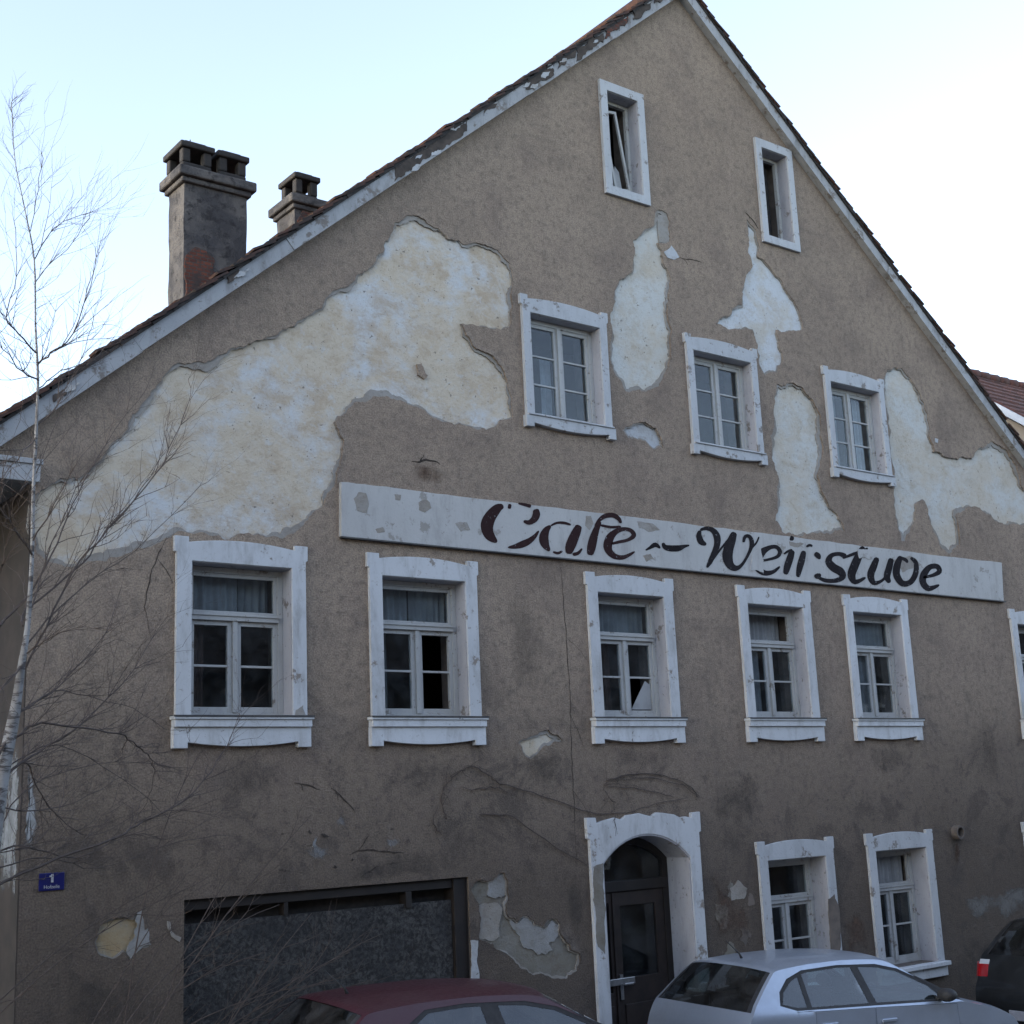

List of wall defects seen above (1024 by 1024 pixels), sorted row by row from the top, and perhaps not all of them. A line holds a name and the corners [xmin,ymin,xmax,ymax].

peeling [523,0,663,90]
peeling [395,121,467,181]
flaking render [610,210,679,392]
flaking render [26,212,516,567]
flaking render [623,418,665,449]
flaking render [716,221,846,547]
flaking render [884,368,1024,554]
flaking render [519,725,566,759]
crack [561,574,617,866]
flaking render [95,906,151,959]
flaking render [470,869,584,979]